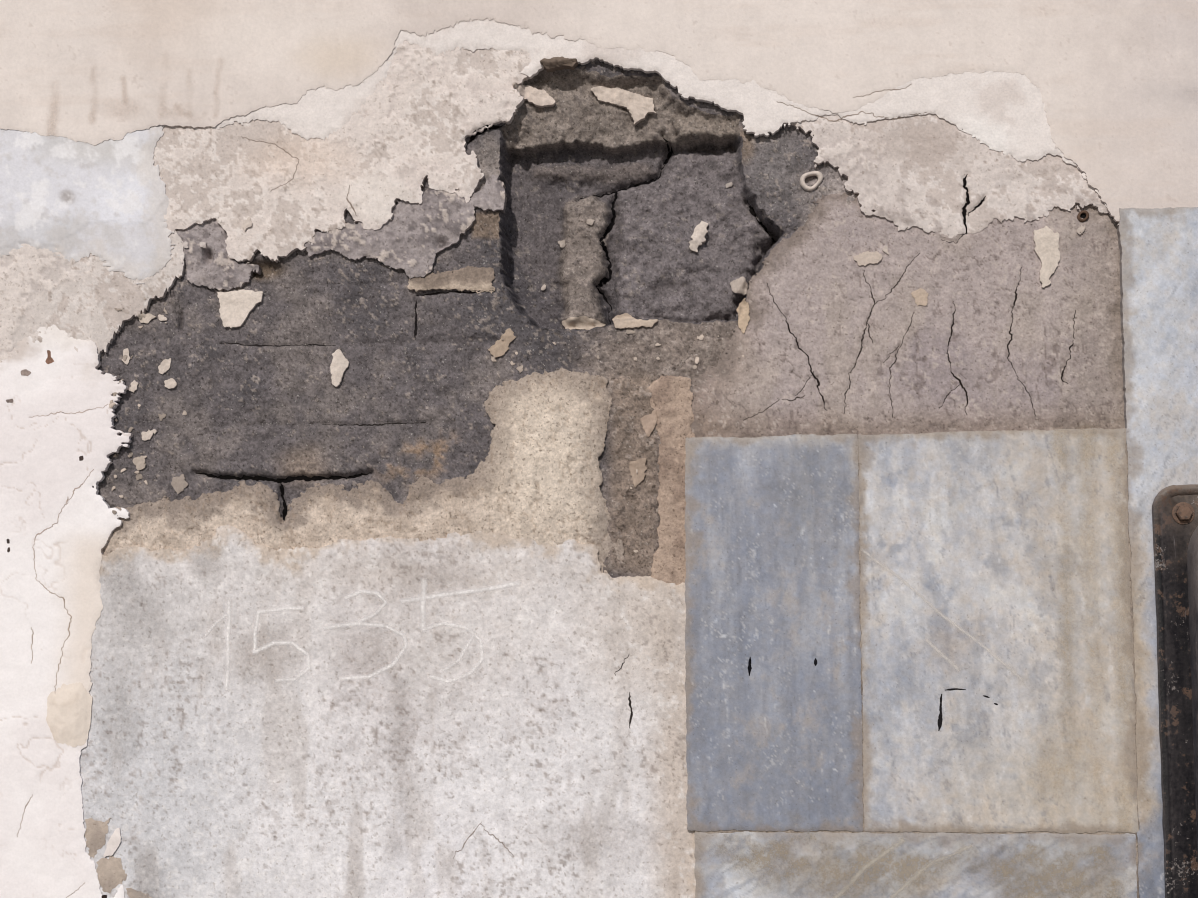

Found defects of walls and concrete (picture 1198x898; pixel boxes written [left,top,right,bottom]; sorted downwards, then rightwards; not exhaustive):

spalling [0,40,1125,585]
crack [744,175,986,420]
crack [1007,267,1036,416]
crack [1061,310,1076,384]
crack [196,472,372,521]
peeling [84,818,152,898]